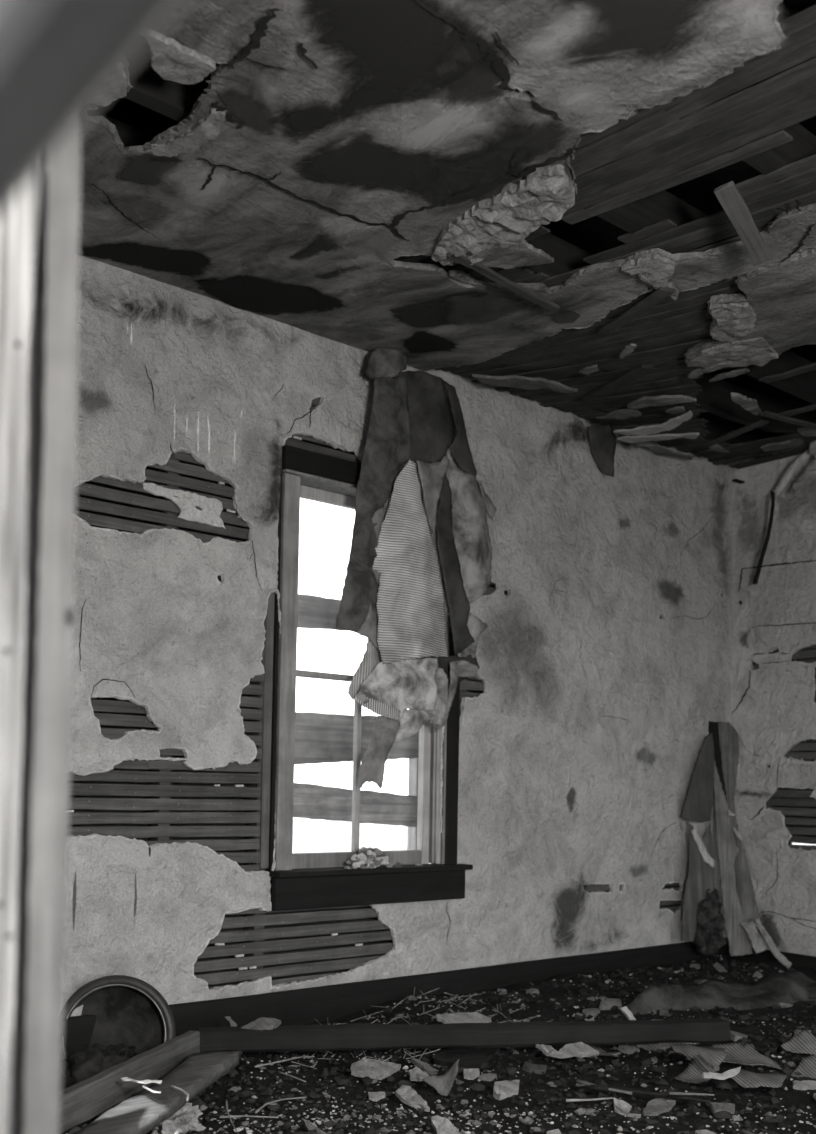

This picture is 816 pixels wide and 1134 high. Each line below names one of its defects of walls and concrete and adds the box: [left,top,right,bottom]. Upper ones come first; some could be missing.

crack [230,8,318,71]
damp [219,0,568,205]
crack [462,32,562,121]
damp [531,0,709,64]
flaking render [562,0,816,225]
crack [149,157,480,241]
crack [506,148,578,178]
damp [80,242,366,315]
flaking render [389,211,745,293]
damp [389,291,539,354]
flaking render [434,246,816,469]
flaking render [69,447,397,991]